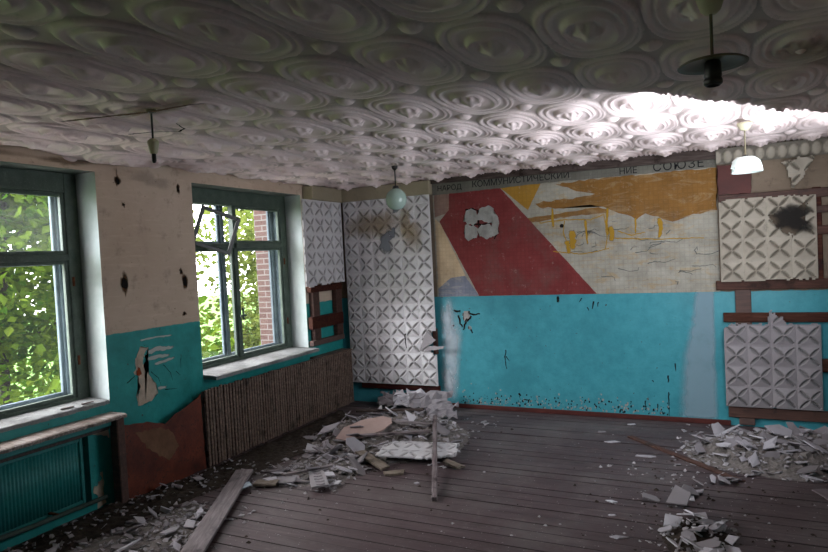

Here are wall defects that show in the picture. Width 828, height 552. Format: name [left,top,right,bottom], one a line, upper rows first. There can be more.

peeling [453,310,480,333]
peeling [133,346,158,406]
peeling [461,383,670,415]